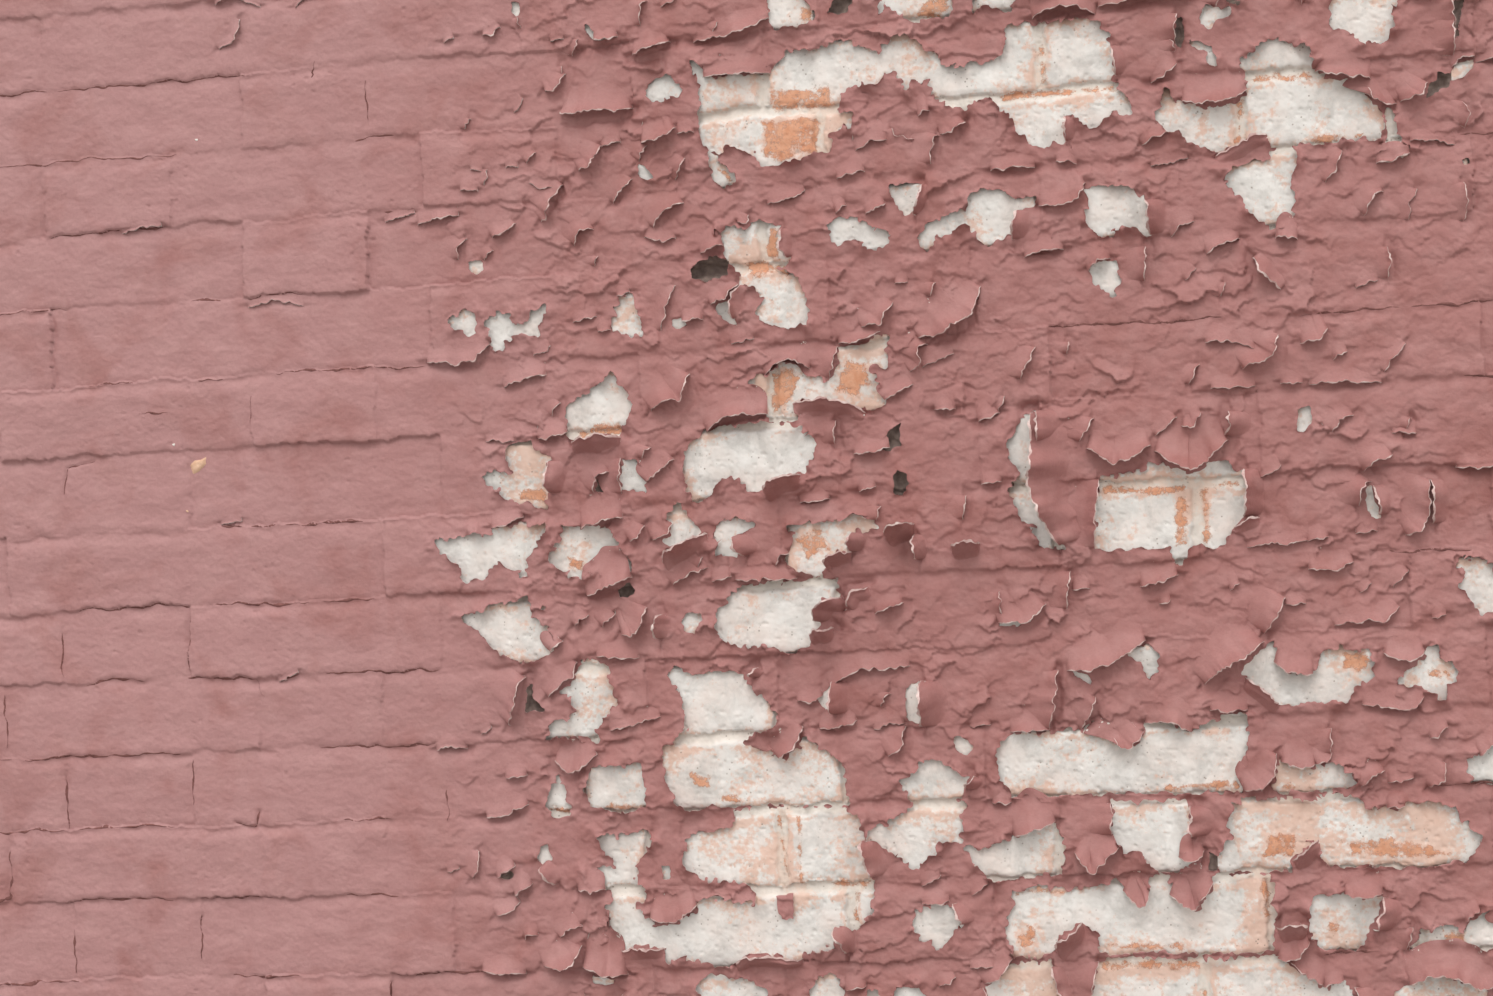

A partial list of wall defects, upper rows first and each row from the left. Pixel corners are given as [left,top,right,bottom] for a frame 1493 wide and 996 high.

crack [0,75,249,97]
crack [5,154,176,167]
crack [51,227,163,239]
peeling [384,169,516,274]
crack [199,366,425,419]
crack [222,519,363,528]
peeling [427,0,1493,996]
crack [60,598,438,697]
crack [322,741,435,749]
crack [0,686,195,903]
crack [0,896,272,986]
crack [389,970,484,996]